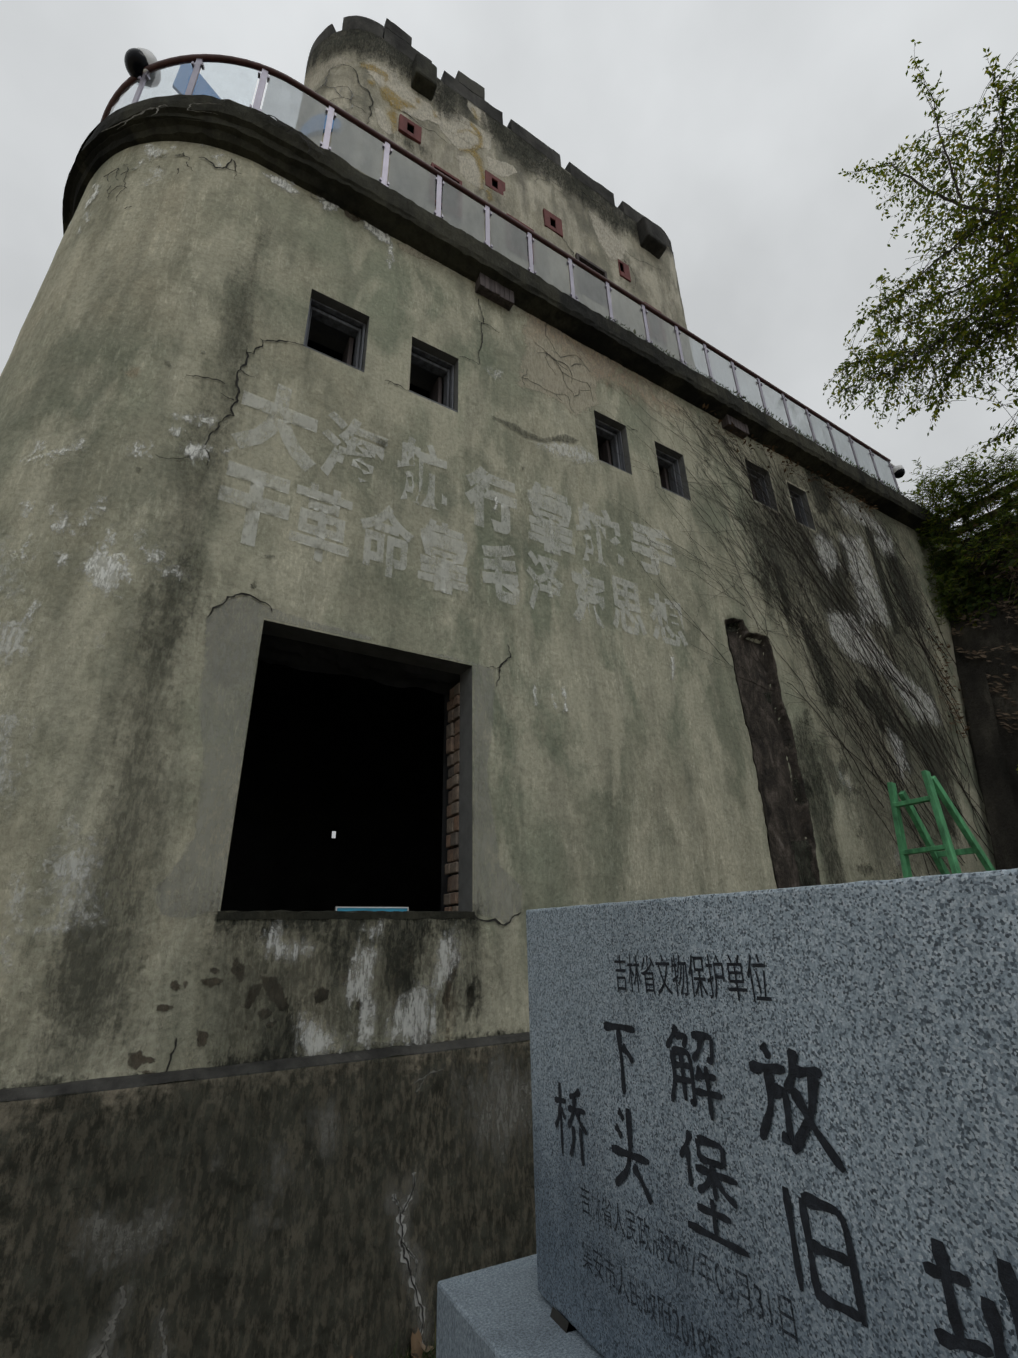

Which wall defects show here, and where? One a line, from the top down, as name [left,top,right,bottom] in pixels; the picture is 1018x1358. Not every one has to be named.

crack [315,64,447,143]
crack [104,167,132,209]
crack [175,152,241,175]
crack [522,323,593,411]
crack [156,339,303,465]
crack [207,584,272,618]
peeling [157,958,289,1028]
leakage [0,601,537,1358]
peeling [314,987,329,1003]
peeling [442,948,461,1009]
peeling [128,1050,154,1074]
peeling [197,1031,208,1047]